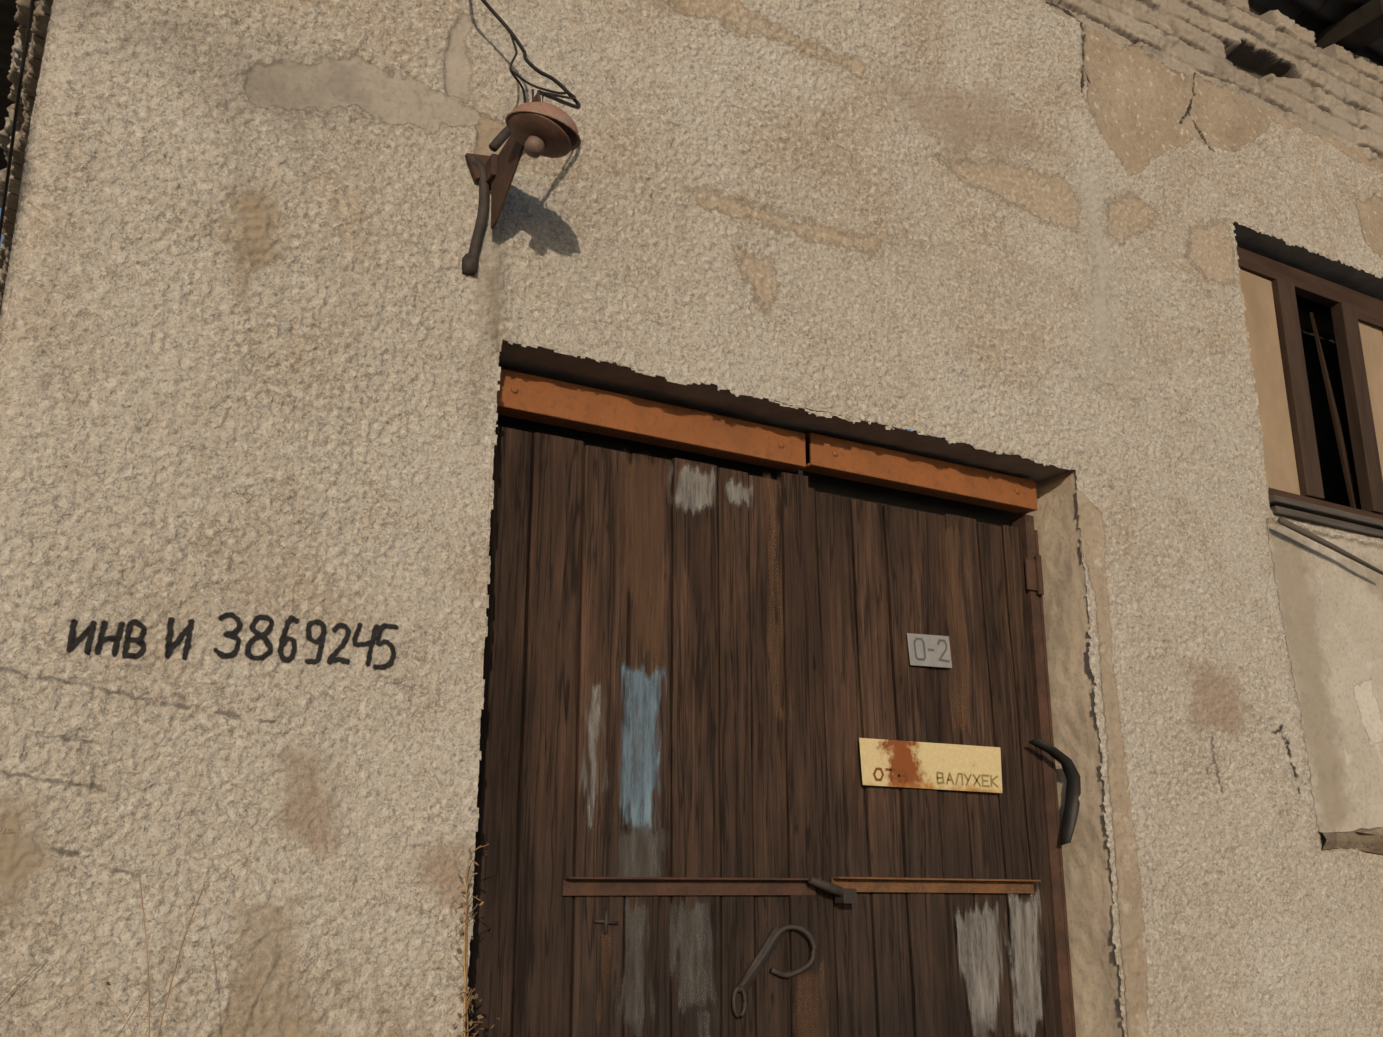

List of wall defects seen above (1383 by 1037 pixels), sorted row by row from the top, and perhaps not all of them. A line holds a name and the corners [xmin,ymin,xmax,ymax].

peeling [1081,22,1383,176]
peeling [1356,193,1383,259]
peeling [1266,520,1383,850]